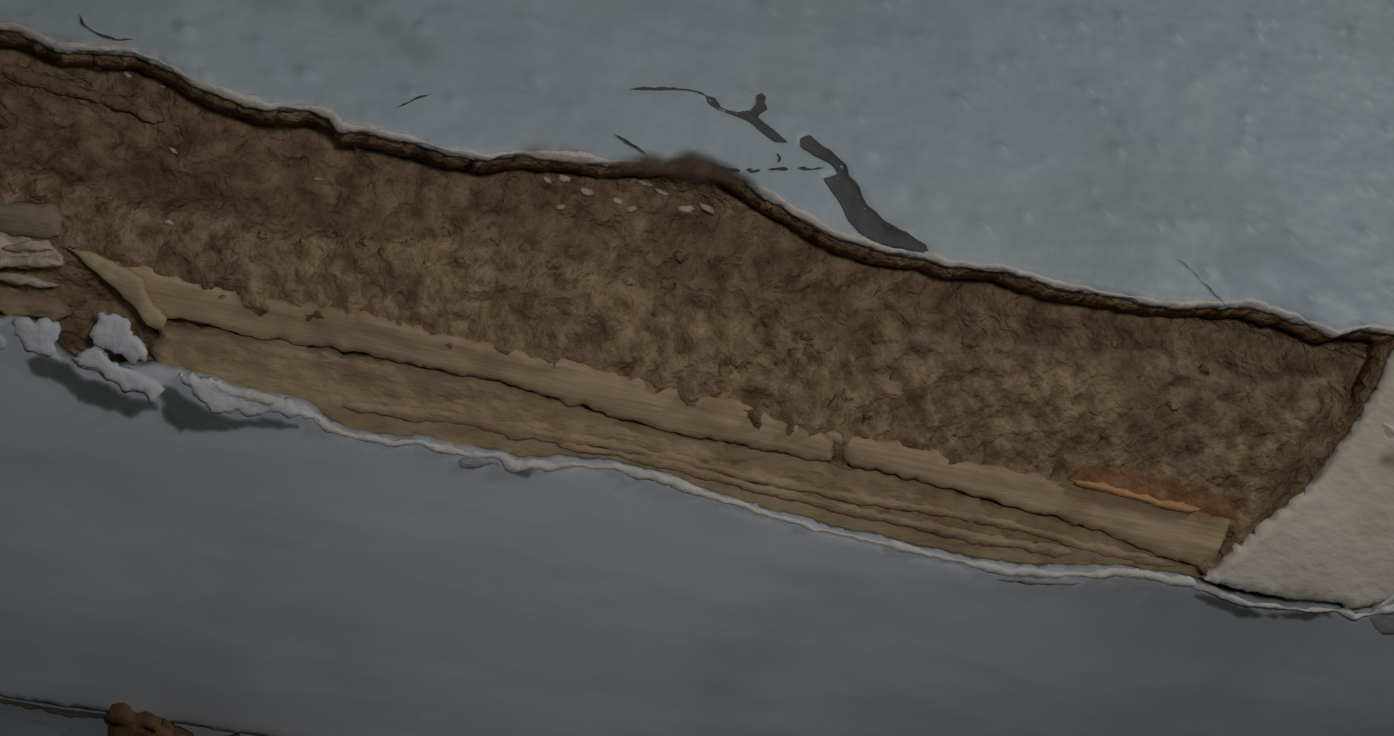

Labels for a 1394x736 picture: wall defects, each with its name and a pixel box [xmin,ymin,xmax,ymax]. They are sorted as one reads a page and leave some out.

flaking render [0,21,1394,537]
crack [633,87,929,253]
flaking render [149,318,1394,621]
flaking render [1369,613,1394,635]